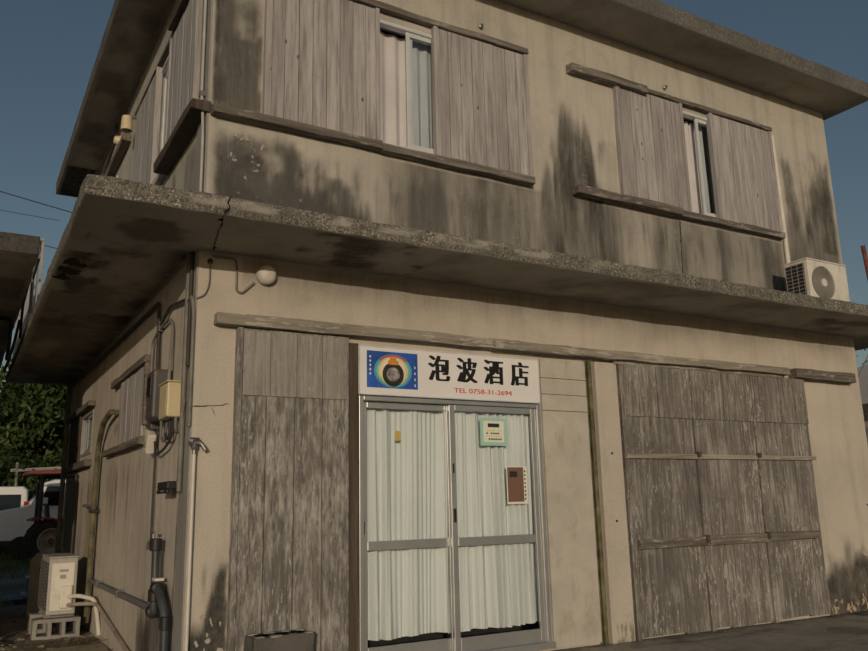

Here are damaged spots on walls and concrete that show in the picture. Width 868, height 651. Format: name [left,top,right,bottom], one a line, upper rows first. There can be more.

crack [213,196,231,250]
damp [217,138,367,221]
damp [402,167,449,235]
damp [463,179,508,242]
damp [547,115,617,263]
damp [760,195,838,291]
peeling [194,614,223,651]
peeling [830,584,868,615]